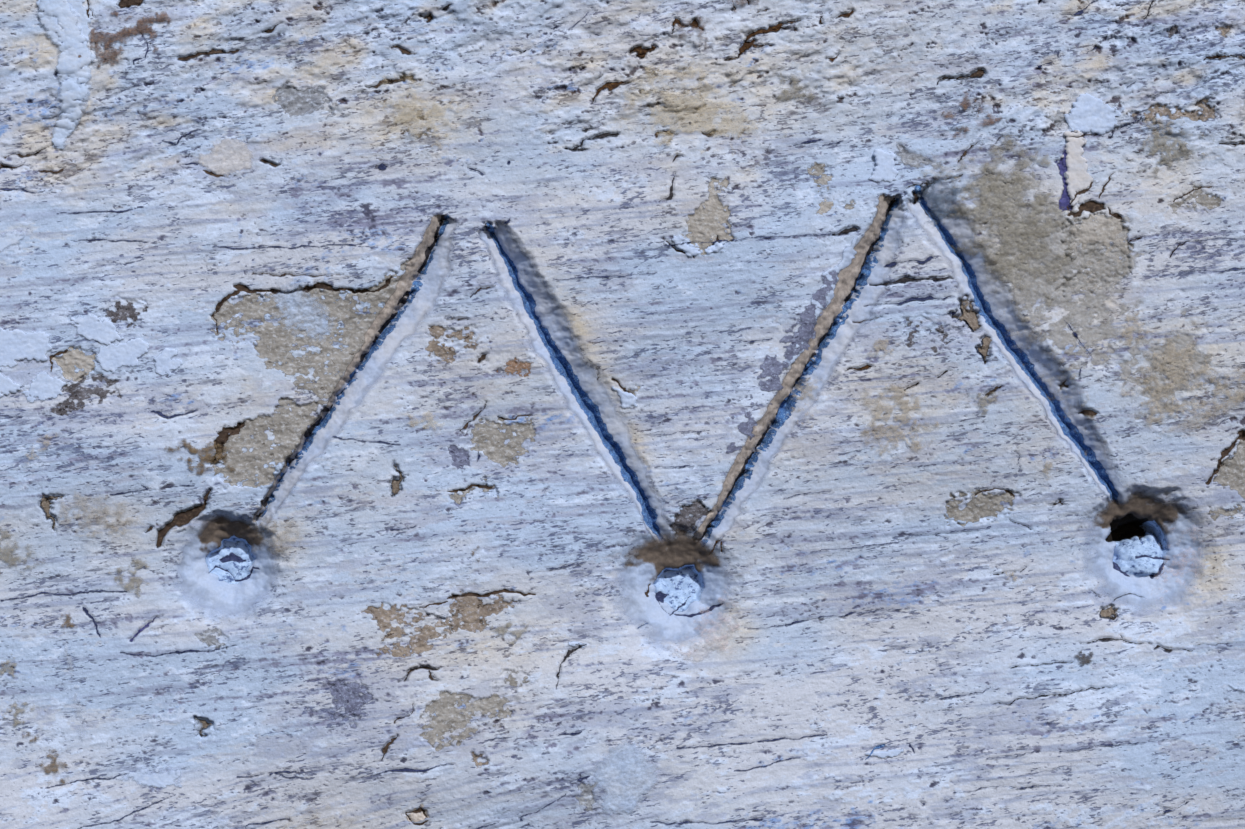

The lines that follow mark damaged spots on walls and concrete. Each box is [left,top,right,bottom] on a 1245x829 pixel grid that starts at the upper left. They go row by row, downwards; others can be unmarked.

spalling [663,177,736,258]
spalling [210,258,411,488]
spalling [391,465,403,495]
spalling [448,479,499,504]
spalling [448,415,536,470]
spalling [944,488,1015,526]
spalling [1206,430,1245,521]
spalling [361,589,536,658]
spalling [418,671,529,767]